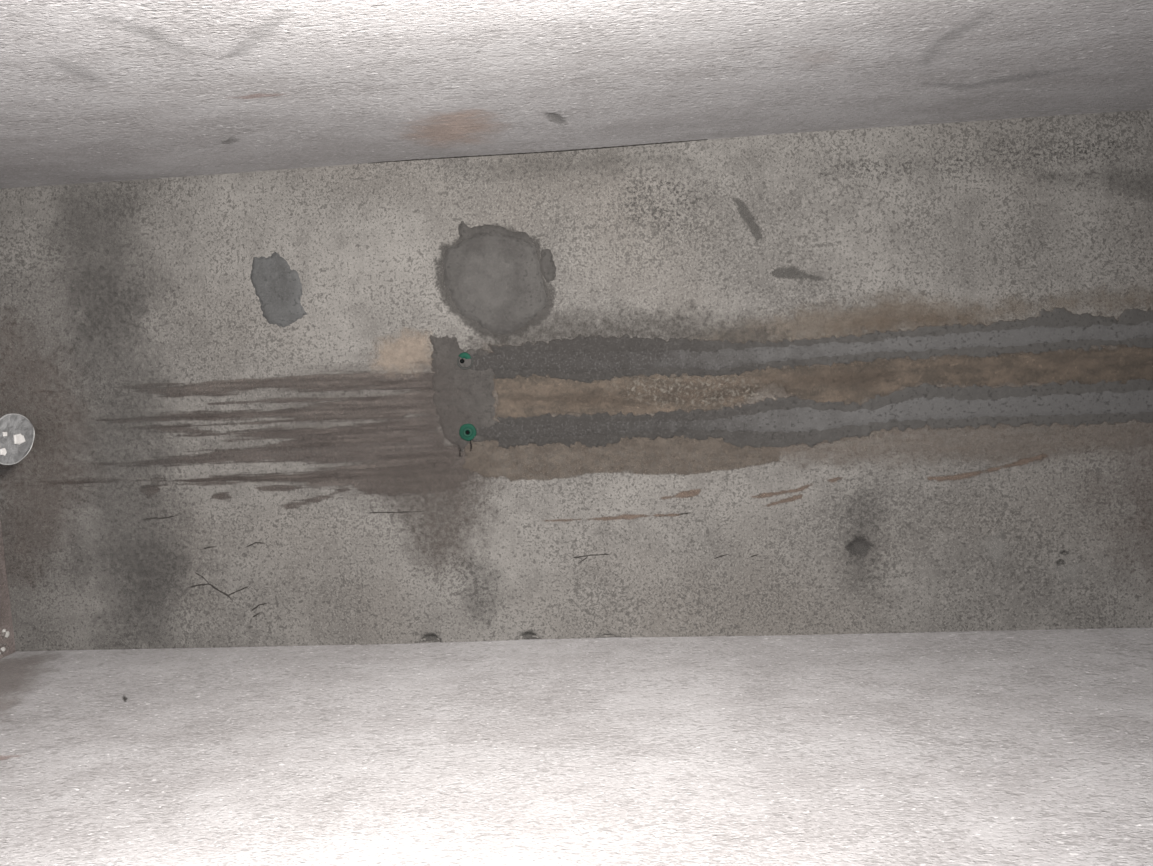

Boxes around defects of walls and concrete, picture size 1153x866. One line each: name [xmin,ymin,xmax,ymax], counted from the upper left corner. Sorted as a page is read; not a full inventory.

corrosion [492,345,1153,422]
water stain [96,372,484,564]
corrosion [661,489,700,499]
corrosion [752,485,810,506]
corrosion [463,423,1153,481]
crack [188,546,267,617]